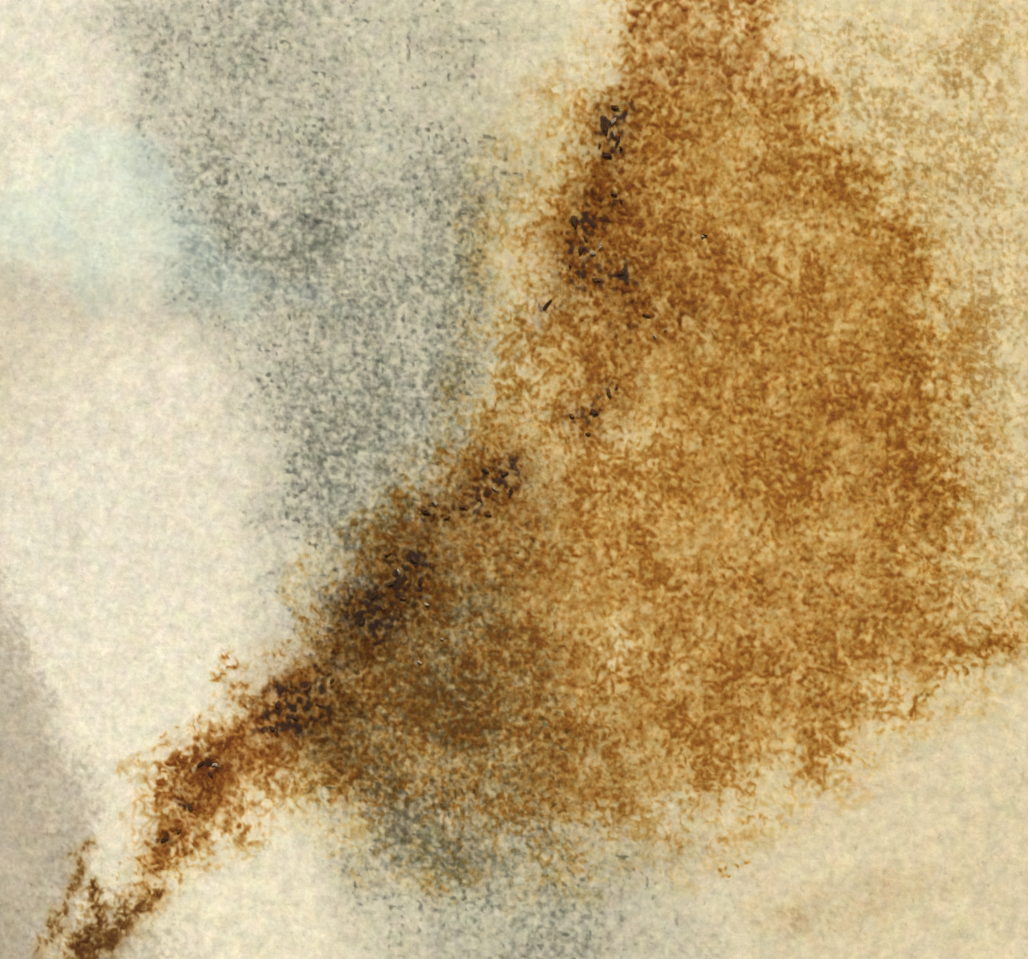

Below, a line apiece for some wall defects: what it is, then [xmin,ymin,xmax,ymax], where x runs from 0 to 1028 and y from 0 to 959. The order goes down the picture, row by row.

rust [138,0,1013,873]